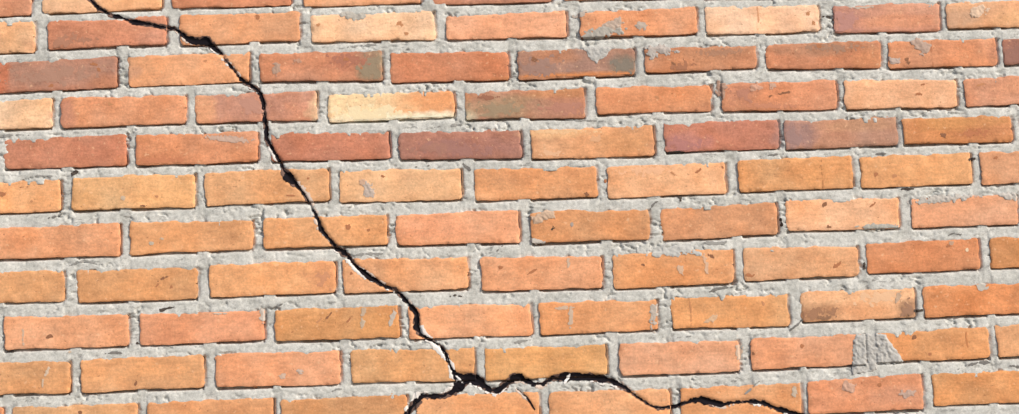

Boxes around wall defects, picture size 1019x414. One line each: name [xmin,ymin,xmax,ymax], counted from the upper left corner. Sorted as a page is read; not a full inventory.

crack [88,0,804,414]